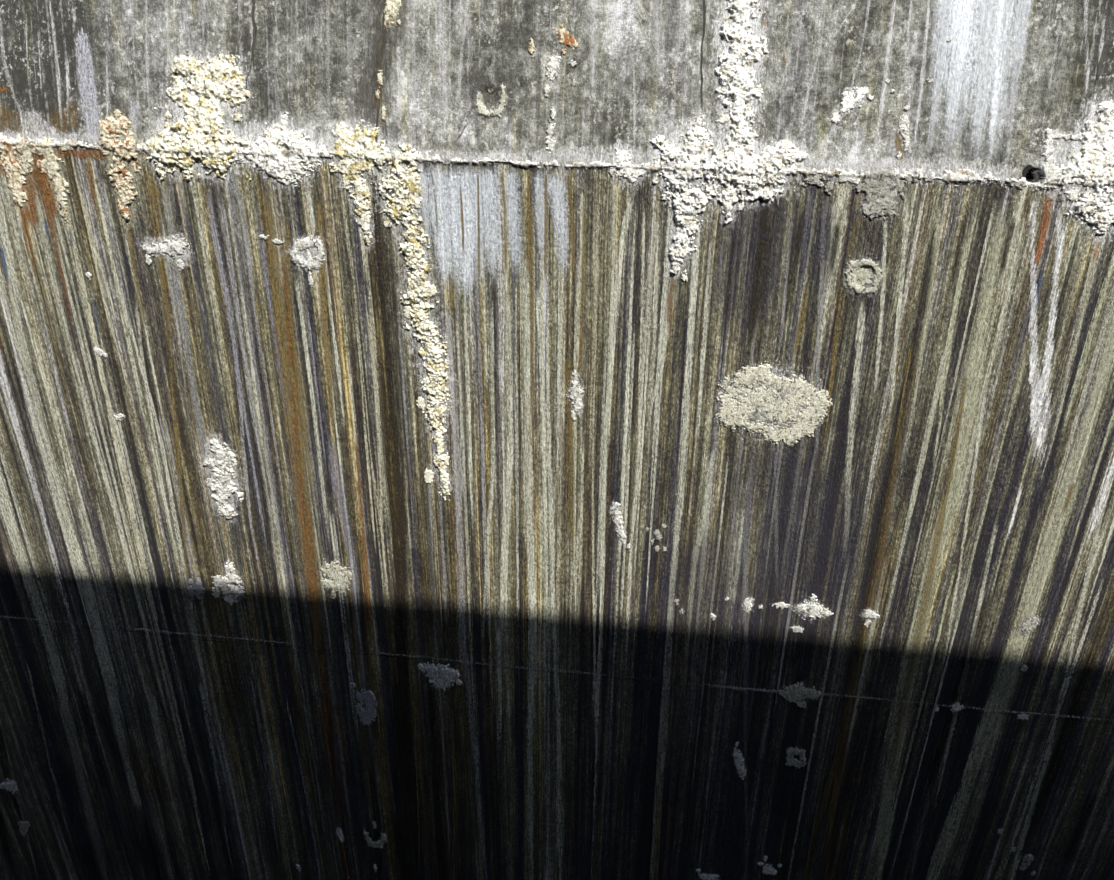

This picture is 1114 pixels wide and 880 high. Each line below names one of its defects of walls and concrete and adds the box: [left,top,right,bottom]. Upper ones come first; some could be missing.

corrosion [0,144,139,302]
leakage [0,183,165,880]
leakage [104,185,197,587]
leakage [141,174,301,649]
leakage [490,173,562,880]
leakage [548,177,584,611]
leakage [589,199,636,763]
leakage [698,245,711,427]
leakage [730,485,848,868]
leakage [839,211,943,749]
leakage [869,209,1025,880]
leakage [928,203,1114,880]